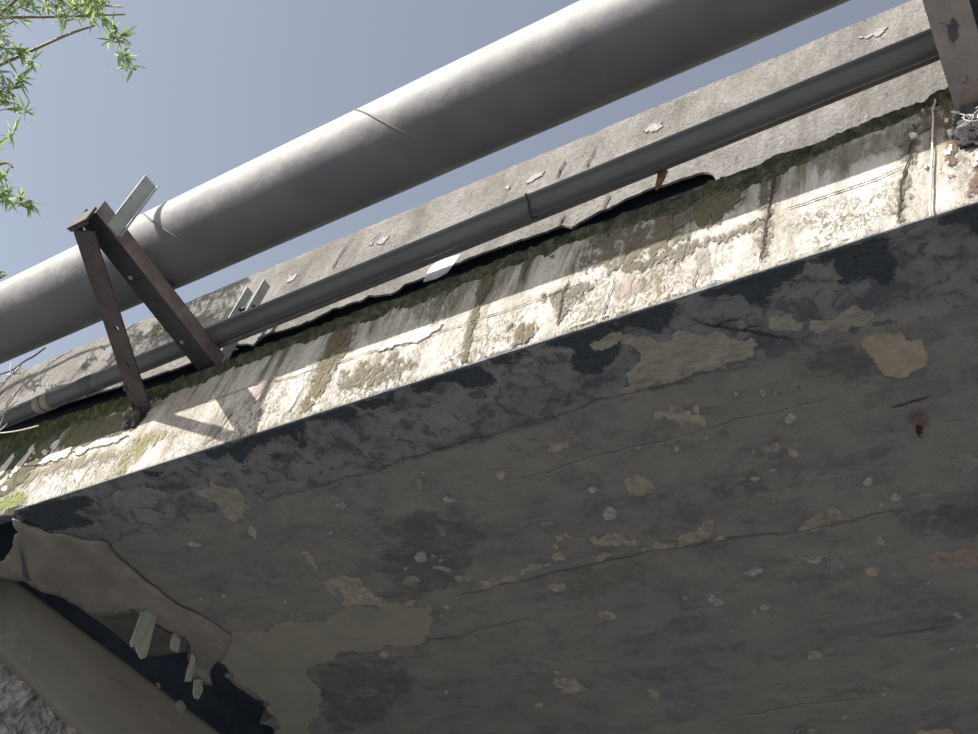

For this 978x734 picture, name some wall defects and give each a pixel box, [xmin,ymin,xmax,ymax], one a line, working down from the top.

crack [751,127,915,263]
damp [410,273,538,395]
peeling [590,330,759,394]
crack [693,319,793,340]
peeling [768,305,929,378]
peeling [653,404,707,427]
damp [0,433,119,497]
damp [18,496,93,531]
spalling [302,547,417,608]